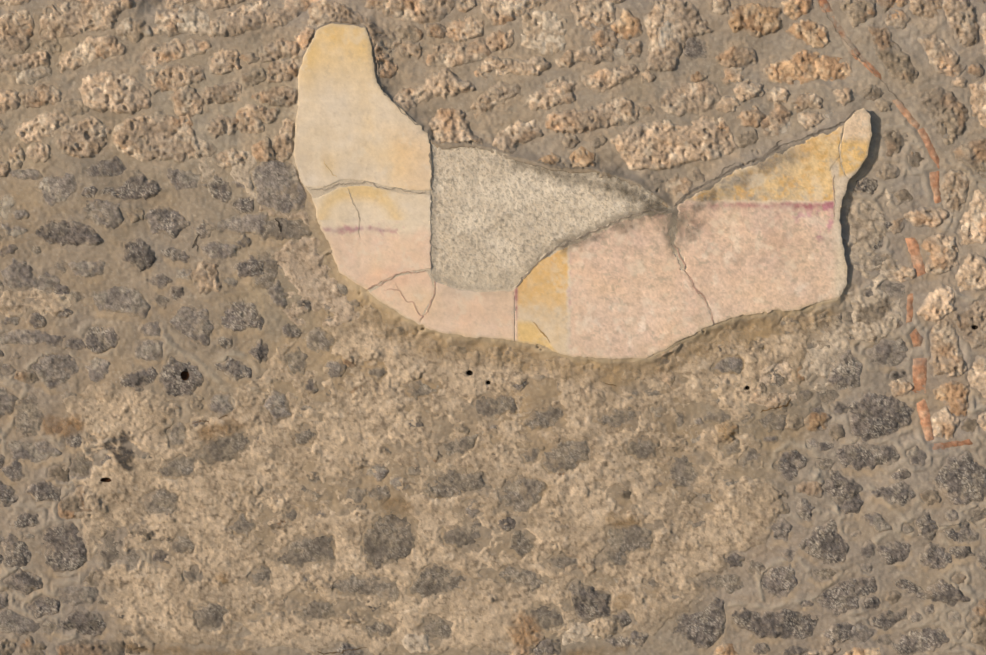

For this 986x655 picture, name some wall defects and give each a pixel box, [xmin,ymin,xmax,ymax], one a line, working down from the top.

peeling [191,136,215,183]
crack [309,85,433,237]
crack [515,110,855,288]
crack [361,270,435,321]
crack [673,244,715,324]
spalling [61,150,901,655]